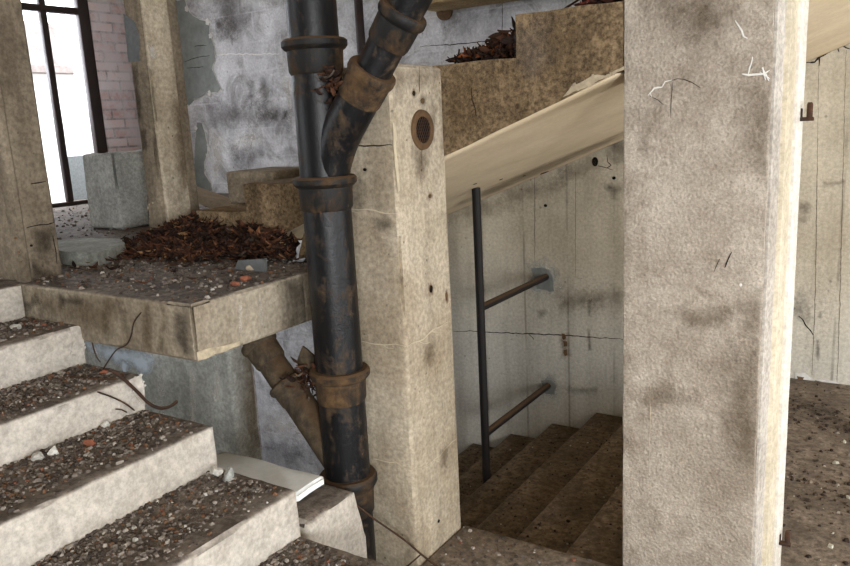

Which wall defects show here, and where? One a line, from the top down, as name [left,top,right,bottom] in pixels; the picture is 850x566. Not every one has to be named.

spalling [176,0,224,109]
crack [454,330,623,340]